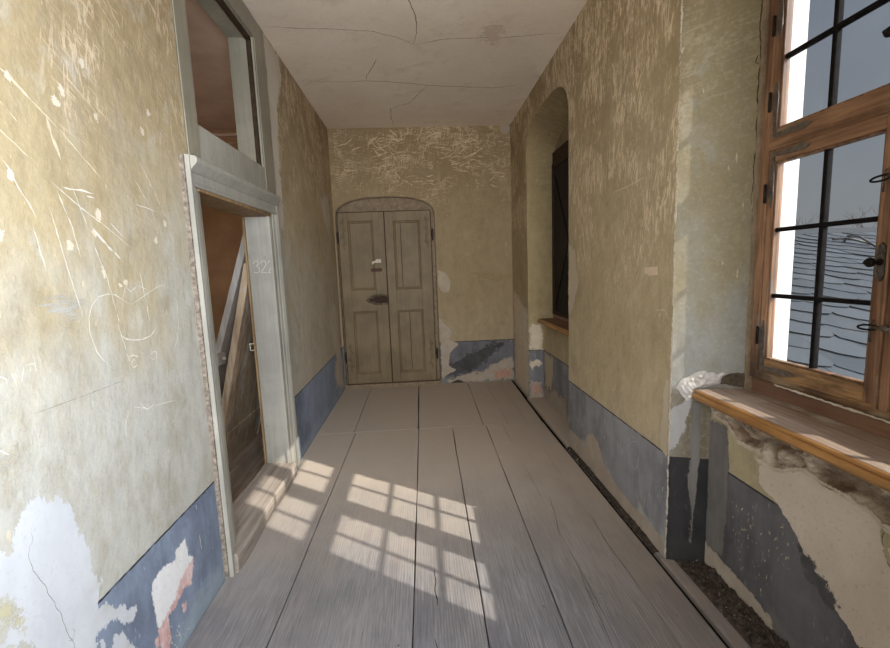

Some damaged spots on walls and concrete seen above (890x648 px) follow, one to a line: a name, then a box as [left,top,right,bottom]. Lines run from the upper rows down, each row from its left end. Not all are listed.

damp [447,357,514,383]
spalling [711,408,890,534]
crack [28,525,75,647]
peeling [704,541,774,630]